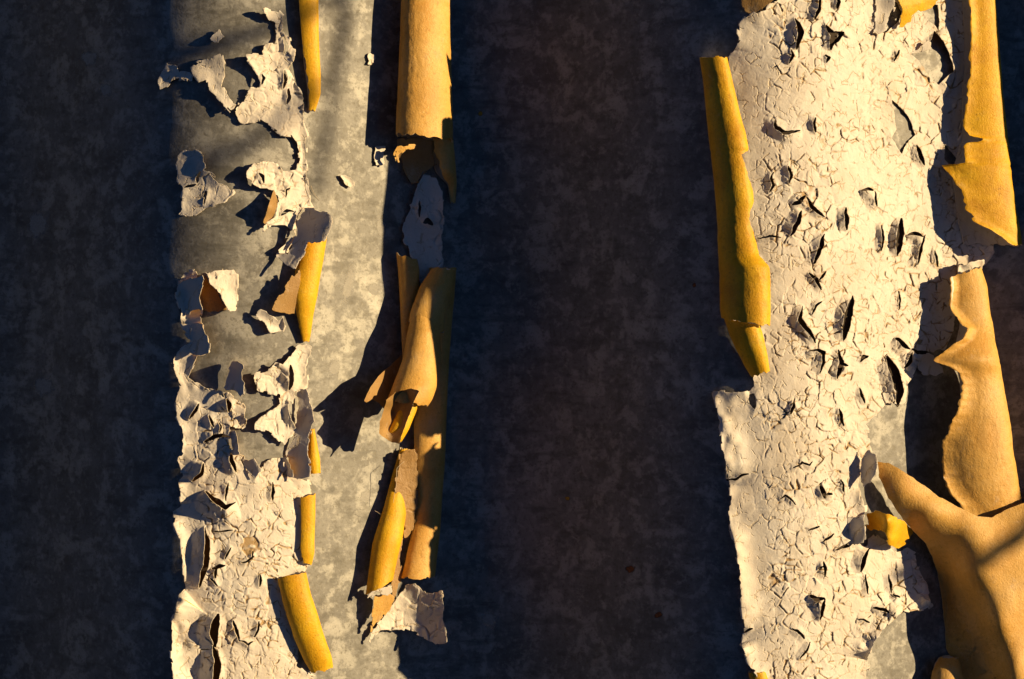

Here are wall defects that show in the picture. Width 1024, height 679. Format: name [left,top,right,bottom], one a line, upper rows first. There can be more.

peeling [741,0,773,14]
peeling [898,0,938,27]
peeling [158,7,333,333]
peeling [374,146,386,166]
peeling [397,175,456,284]
peeling [953,259,985,277]
peeling [254,340,312,445]
crack [712,0,995,679]
crack [169,269,315,679]
peeling [369,435,447,644]